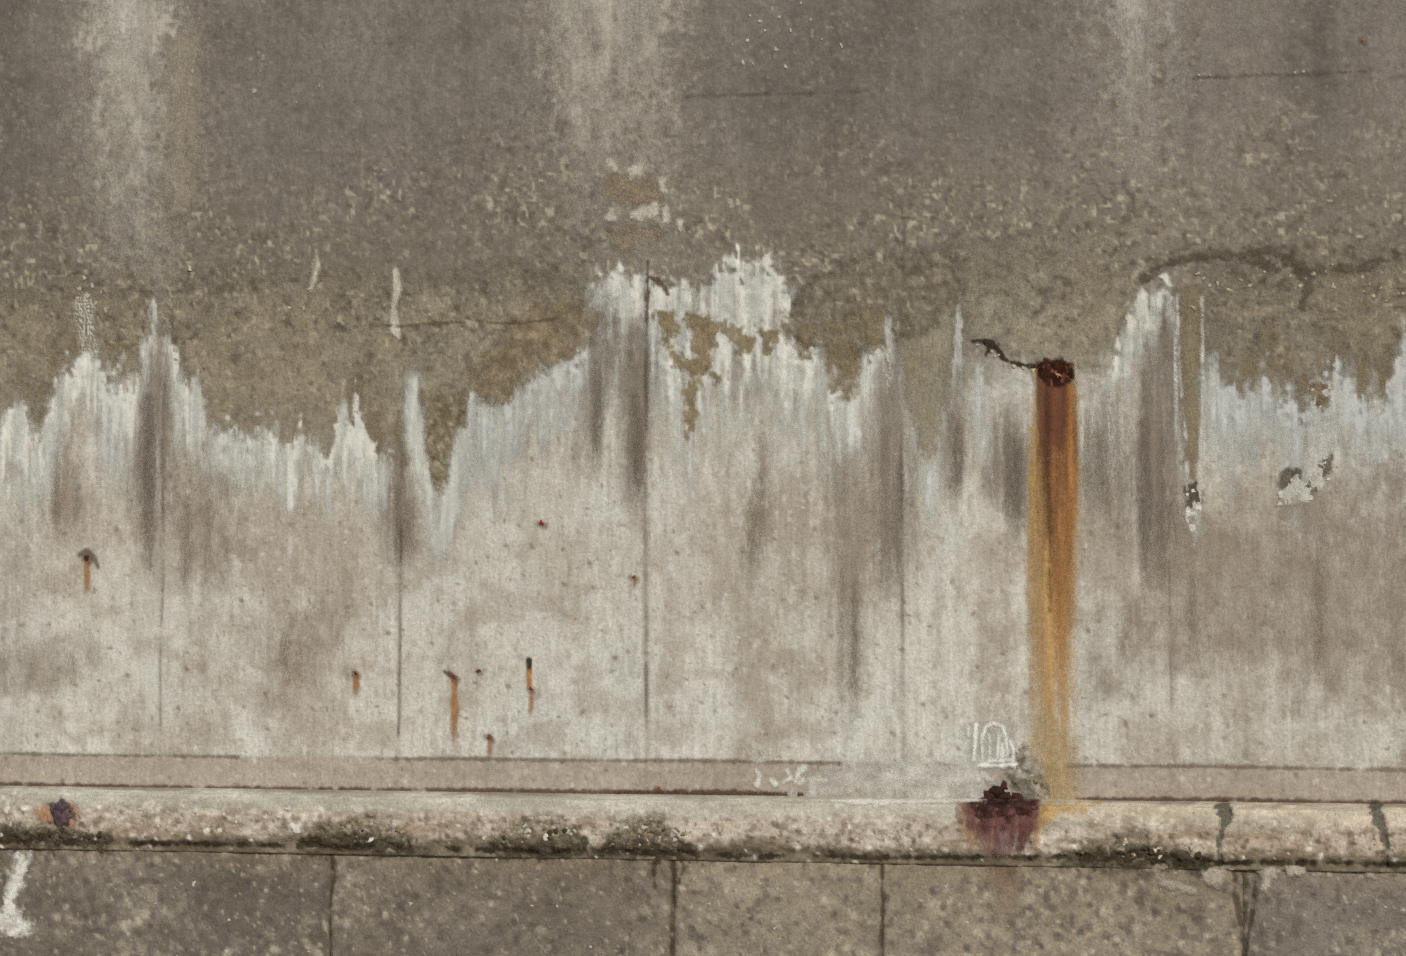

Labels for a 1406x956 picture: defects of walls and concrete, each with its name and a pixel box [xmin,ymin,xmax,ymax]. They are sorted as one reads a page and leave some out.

water stain [513,0,701,225]
rust [78,548,99,588]
water stain [0,299,414,551]
rust [444,670,458,738]
water stain [463,219,1027,638]
rust [959,358,1085,853]
water stain [1073,270,1406,691]
spalling [1277,454,1333,507]